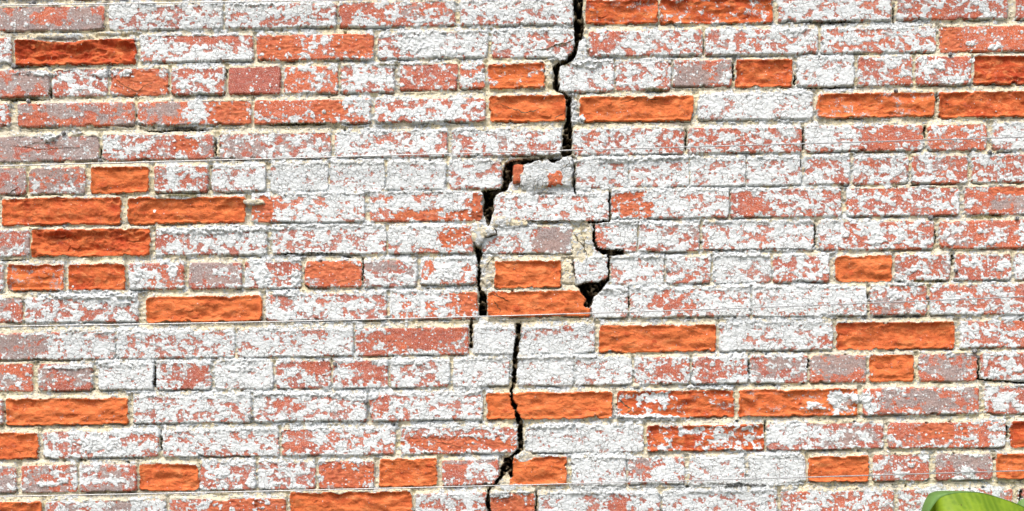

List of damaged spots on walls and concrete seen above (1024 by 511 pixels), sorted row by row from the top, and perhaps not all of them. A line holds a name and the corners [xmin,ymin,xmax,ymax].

crack [469,0,624,511]